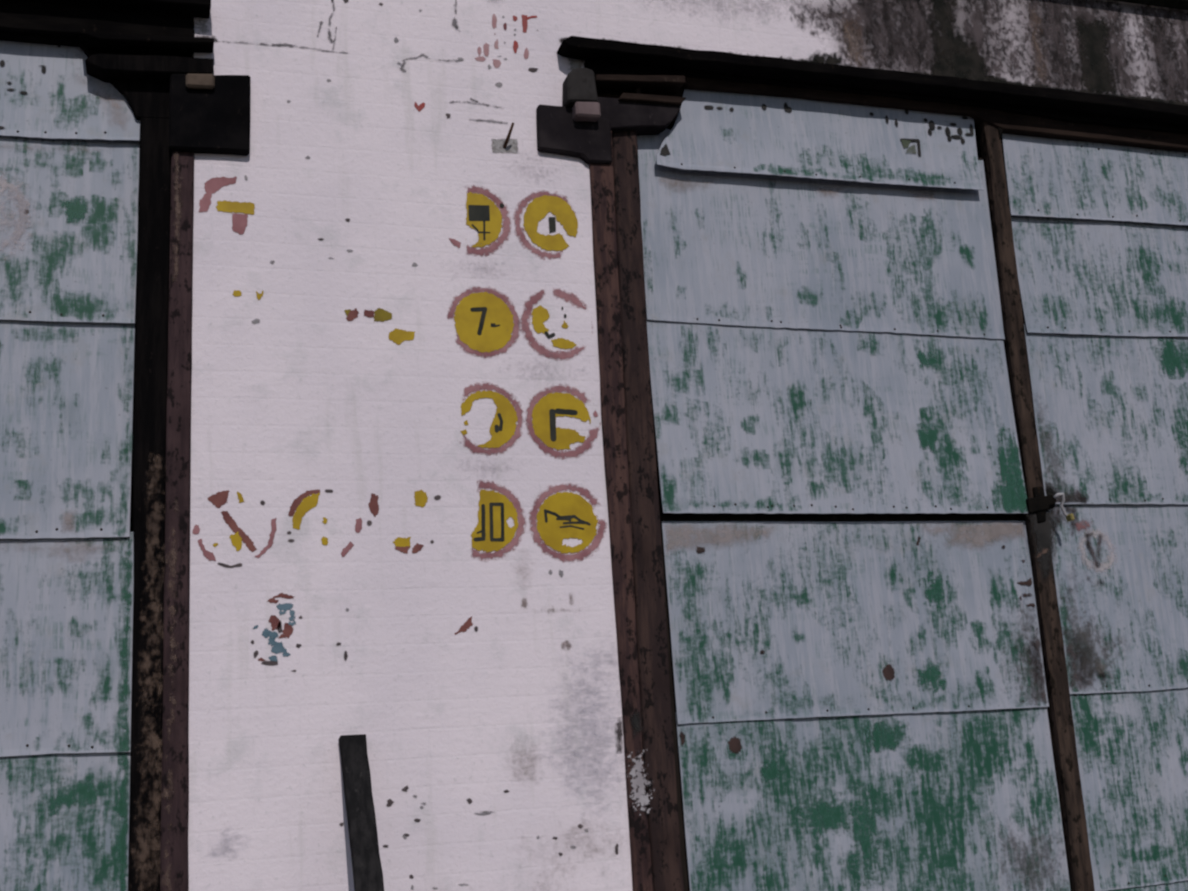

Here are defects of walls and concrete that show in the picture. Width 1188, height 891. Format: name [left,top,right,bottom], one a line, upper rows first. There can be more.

crack [398,54,460,72]
damp [795,0,1188,103]
peeling [1,192,136,340]
peeling [841,212,1027,513]
peeling [1013,167,1188,473]
peeling [721,379,898,511]
peeling [193,489,333,568]
peeling [1,385,177,891]
peeling [251,593,302,665]
peeling [670,523,1068,891]
rust [883,664,895,681]
peeling [1060,589,1188,891]